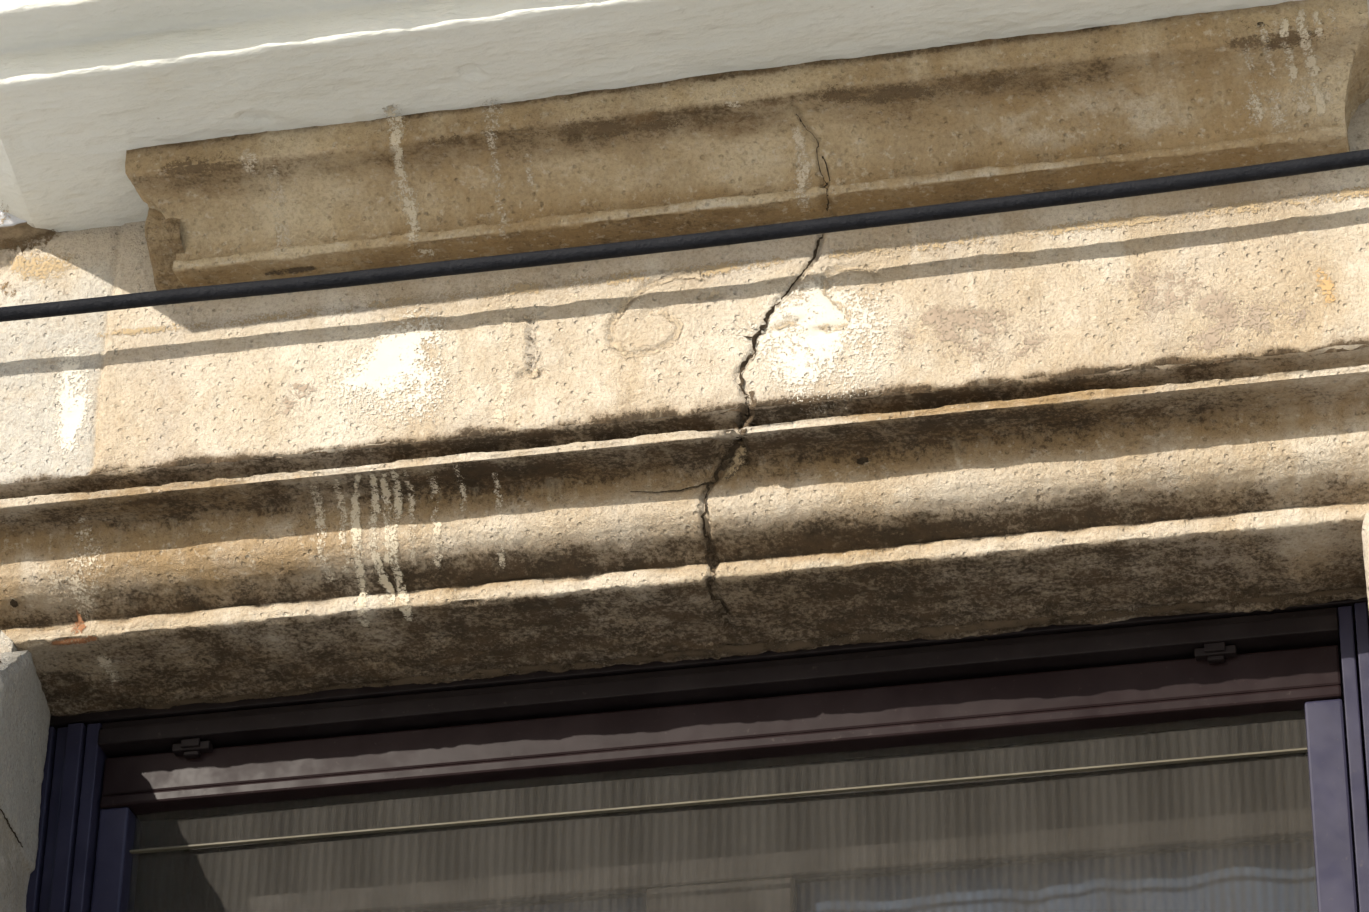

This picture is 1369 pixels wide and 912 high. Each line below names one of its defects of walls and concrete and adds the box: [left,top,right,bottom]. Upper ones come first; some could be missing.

water stain [161,149,315,276]
water stain [382,105,434,258]
water stain [481,99,510,239]
water stain [535,114,682,140]
water stain [816,68,1024,106]
crack [630,114,830,618]
water stain [309,470,443,627]
water stain [453,464,467,511]
water stain [493,473,506,569]
crack [0,809,23,848]